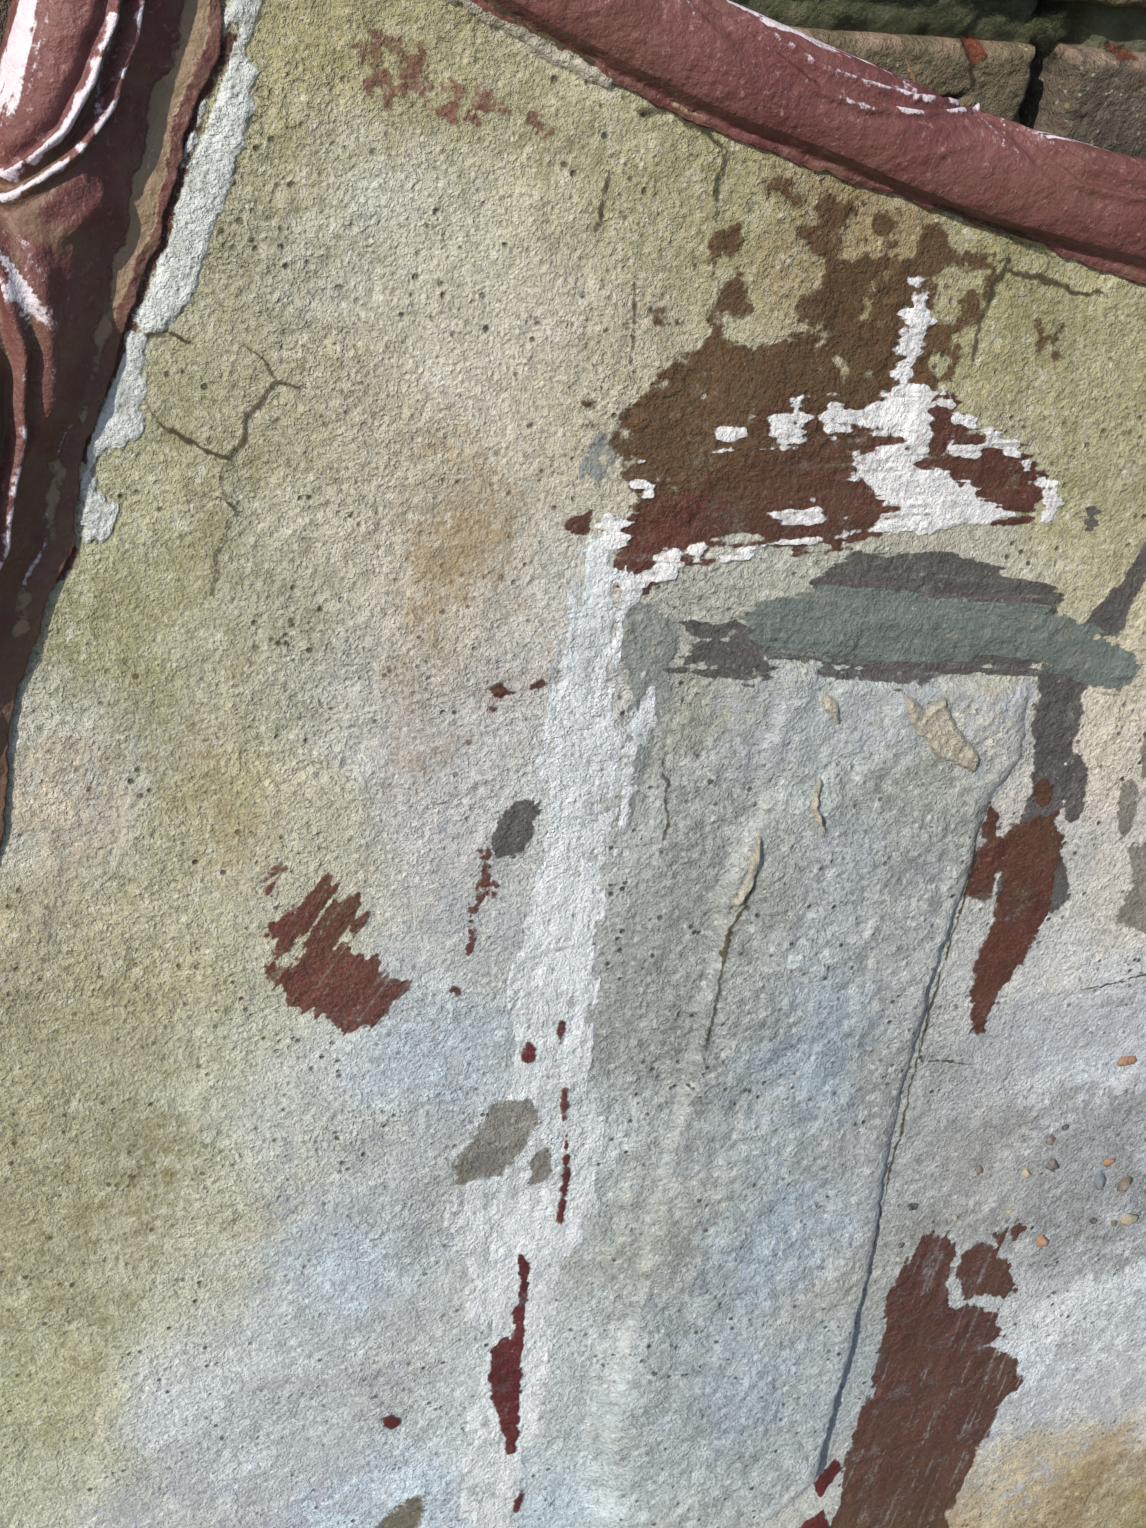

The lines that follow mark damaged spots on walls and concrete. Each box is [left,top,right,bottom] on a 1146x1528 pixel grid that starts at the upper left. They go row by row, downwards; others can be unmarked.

crack [145,331,194,344]
peeling [79,0,261,544]
crack [144,344,306,596]